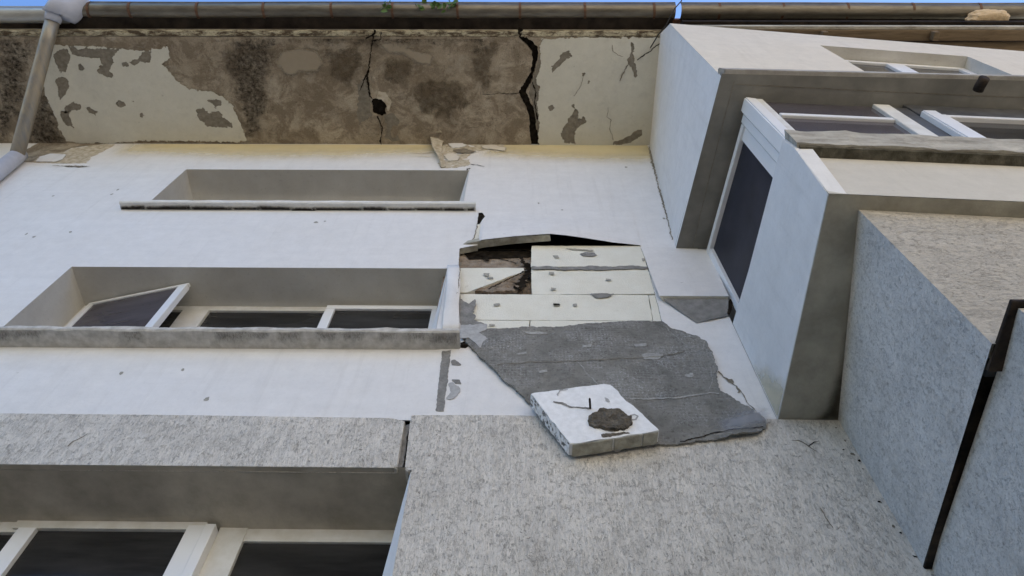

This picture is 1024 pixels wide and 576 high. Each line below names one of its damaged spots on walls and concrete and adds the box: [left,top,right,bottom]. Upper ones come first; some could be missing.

damp [0,37,27,134]
damp [30,88,62,143]
peeling [24,45,247,167]
damp [136,39,433,154]
crack [357,29,400,145]
crack [483,27,540,145]
peeling [536,36,660,145]
peeling [446,379,461,400]